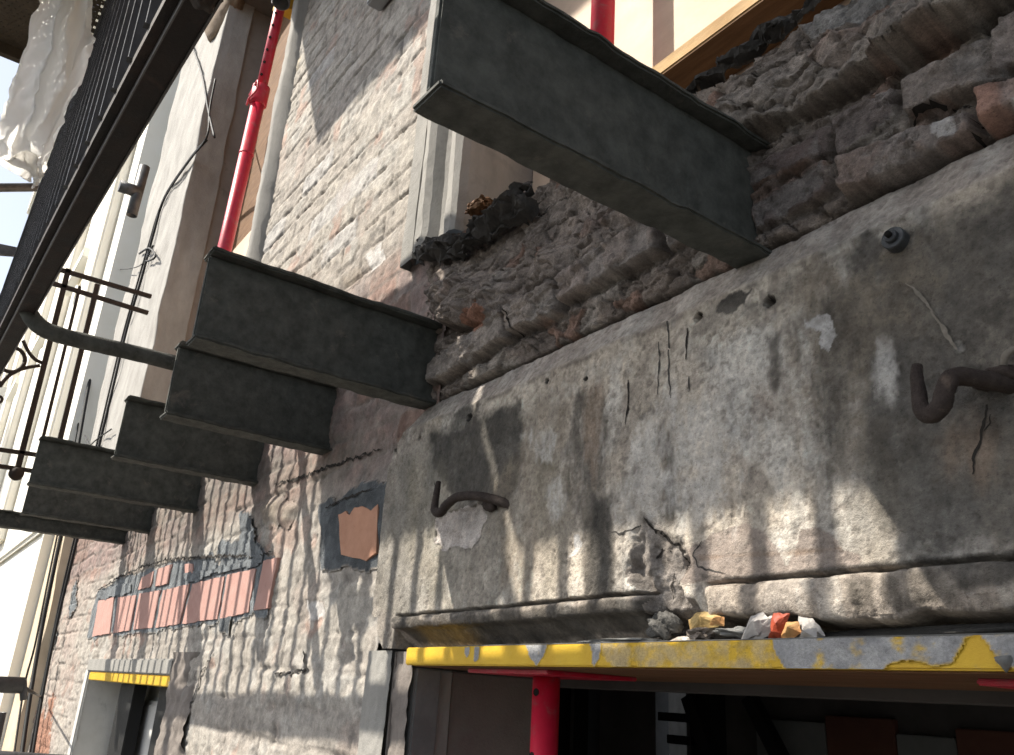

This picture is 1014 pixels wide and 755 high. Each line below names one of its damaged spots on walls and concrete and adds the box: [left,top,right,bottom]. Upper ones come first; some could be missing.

spalling [693,0,1014,250]
spalling [423,179,734,402]
crack [657,321,690,398]
peeling [802,313,838,353]
water stain [116,376,654,647]
spalling [434,503,488,552]
peeling [522,424,569,528]
crack [609,525,641,536]
crack [623,380,631,423]
crack [692,541,727,575]
peeling [590,358,864,637]
crack [971,404,991,474]